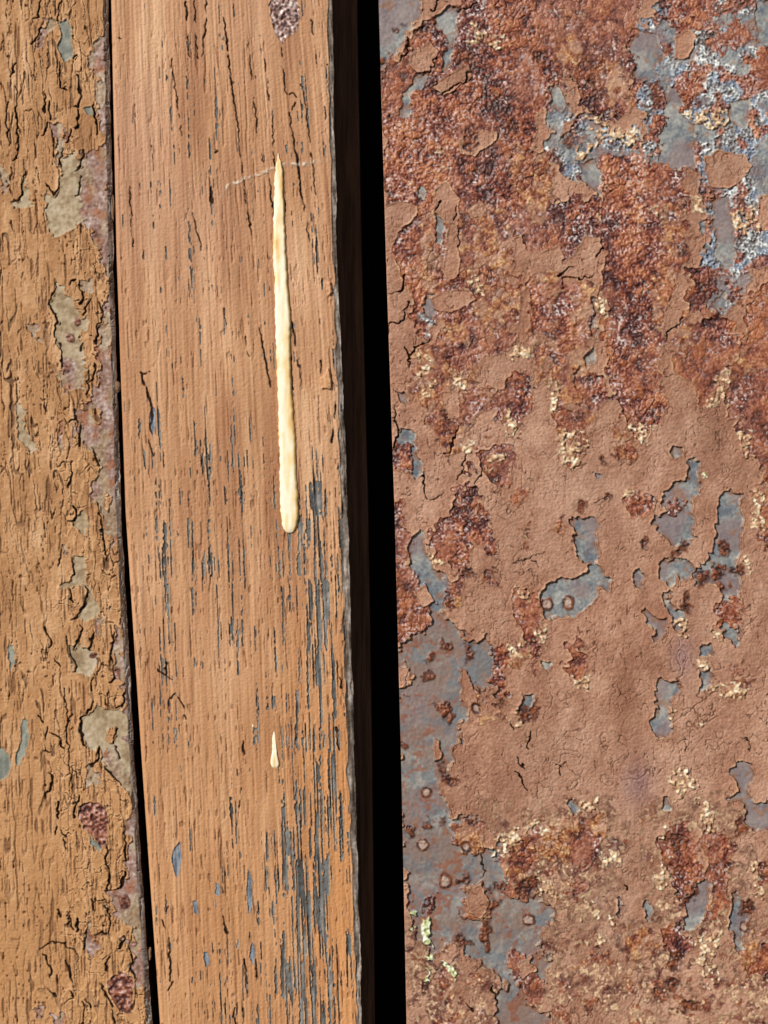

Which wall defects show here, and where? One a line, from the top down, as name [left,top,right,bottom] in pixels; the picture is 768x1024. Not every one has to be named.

crack [5,1,98,203]
peeling [178,222,195,297]
corrosion [381,0,768,728]
peeling [0,0,167,1024]
peeling [138,383,257,749]
peeling [540,516,612,620]
peeling [633,446,752,692]
peeling [398,530,555,1024]
corrosion [405,789,768,1024]